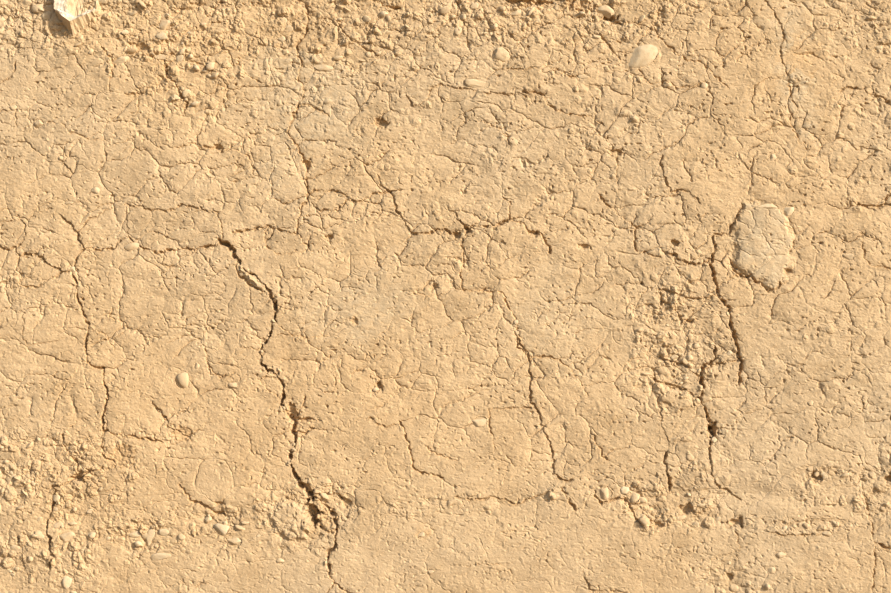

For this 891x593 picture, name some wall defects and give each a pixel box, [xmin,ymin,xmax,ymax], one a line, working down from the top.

crack [839,86,891,106]
crack [857,193,891,210]
crack [849,232,891,270]
crack [0,0,645,593]
crack [599,150,782,501]